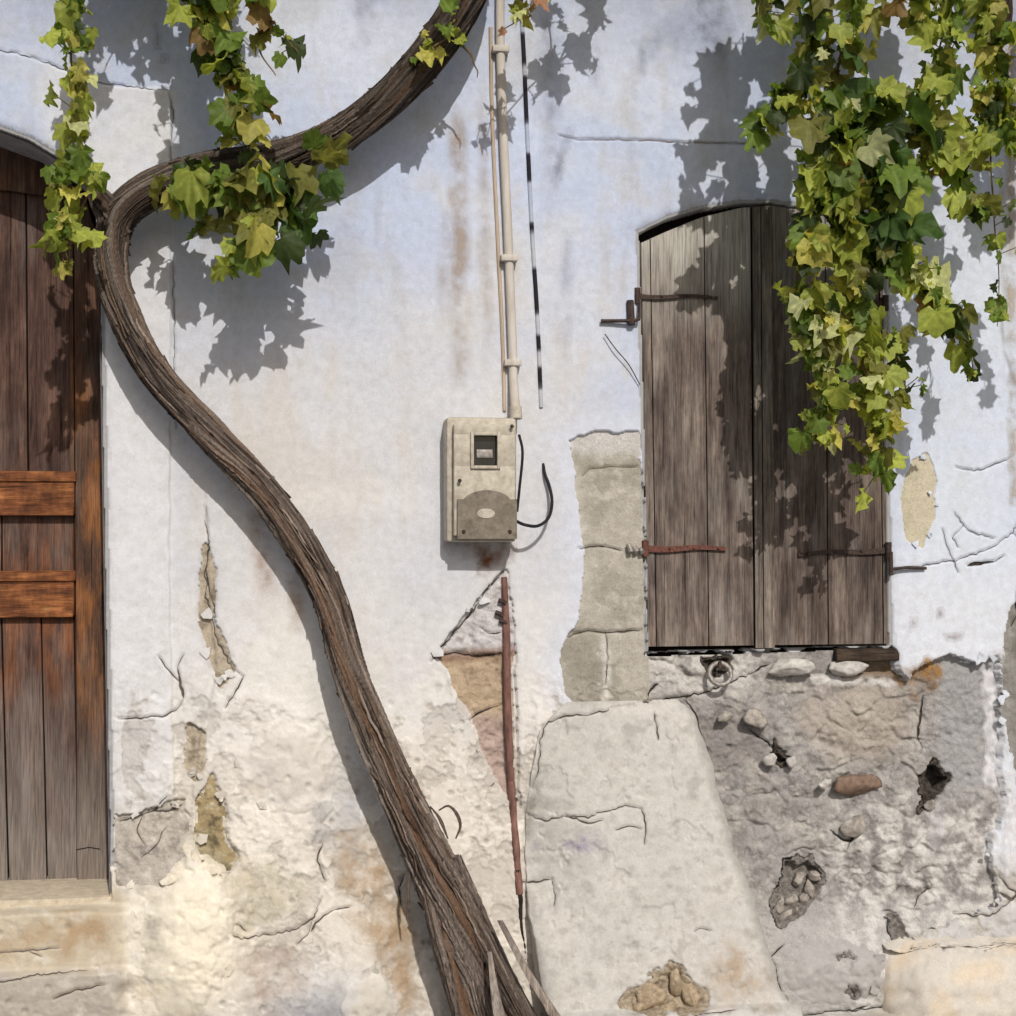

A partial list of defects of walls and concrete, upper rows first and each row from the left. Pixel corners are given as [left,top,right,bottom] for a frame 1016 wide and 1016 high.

crack [560,135,746,144]
crack [905,513,1016,572]
peeling [199,543,235,689]
flaking render [431,569,521,798]
corrosion [899,658,942,687]
crack [533,709,609,784]
flaking render [560,431,1016,1016]
flaking render [115,722,239,889]
crack [532,805,646,845]
crack [233,844,348,944]
crack [522,879,556,904]
crack [0,948,97,999]